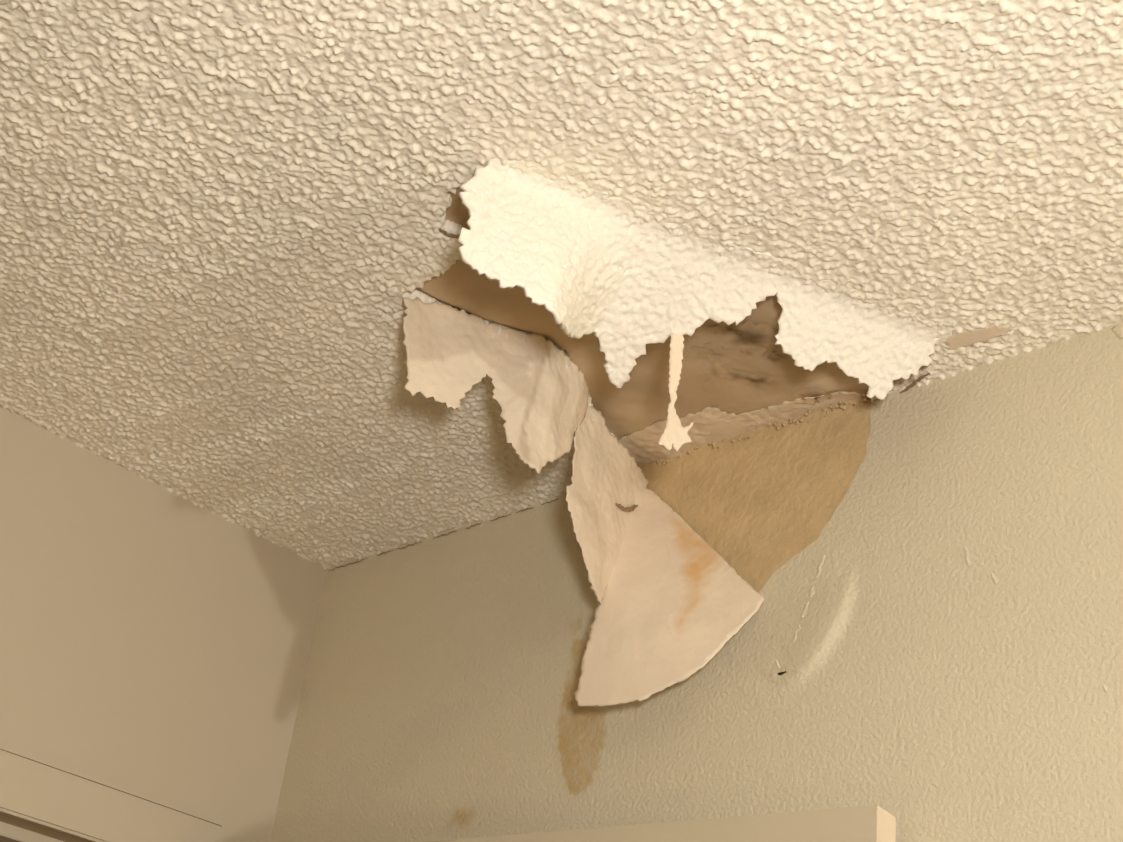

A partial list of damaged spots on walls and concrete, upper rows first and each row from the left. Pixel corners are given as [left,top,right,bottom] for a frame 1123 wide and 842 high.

leakage [554,610,609,799]
peeling [402,158,1017,707]